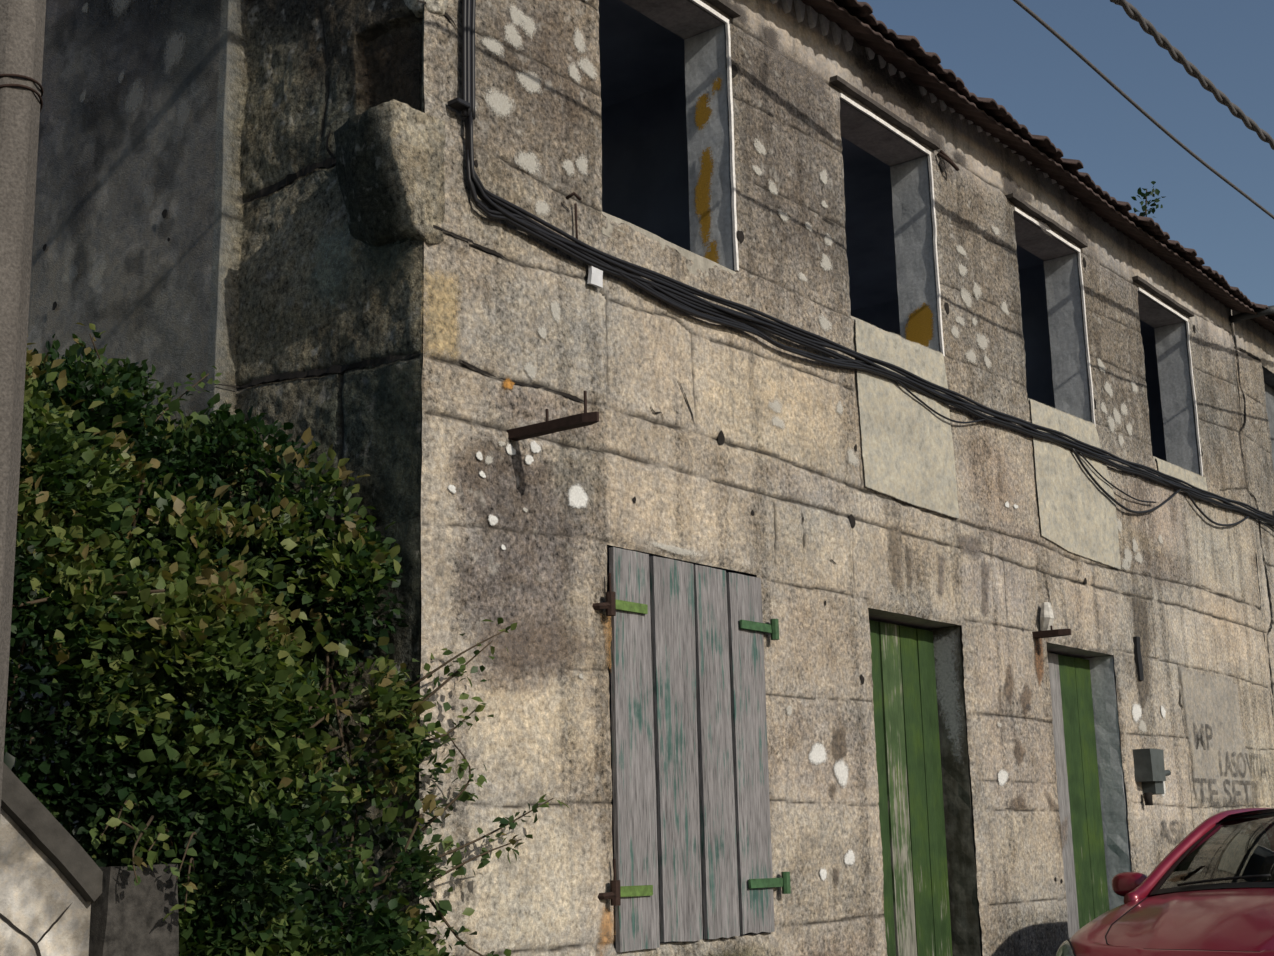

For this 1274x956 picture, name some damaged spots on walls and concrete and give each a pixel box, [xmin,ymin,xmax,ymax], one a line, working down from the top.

crack [0,902,73,956]